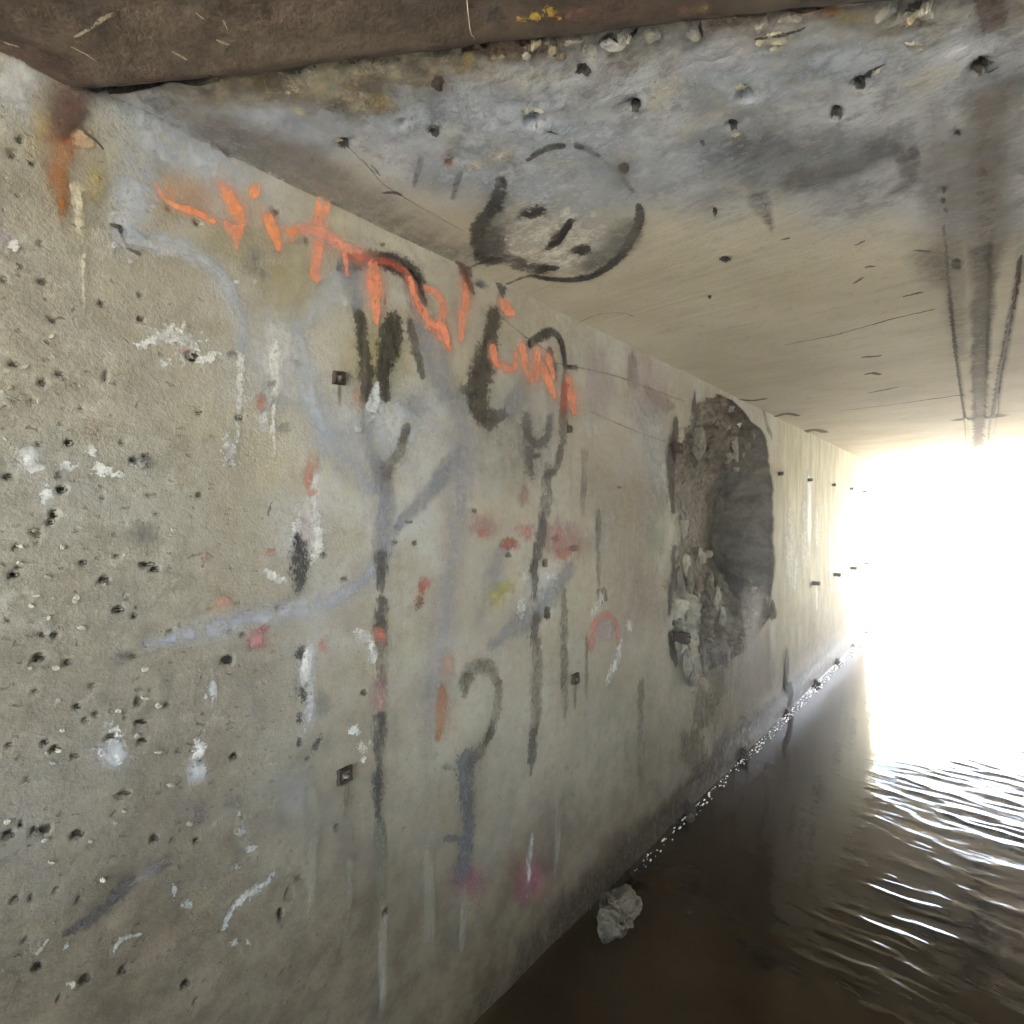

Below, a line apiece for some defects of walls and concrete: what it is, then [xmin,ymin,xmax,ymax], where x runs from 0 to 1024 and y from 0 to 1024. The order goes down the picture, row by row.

rust [31,82,94,216]
crack [786,88,1024,447]
spalling [659,393,777,687]
crack [739,398,828,435]